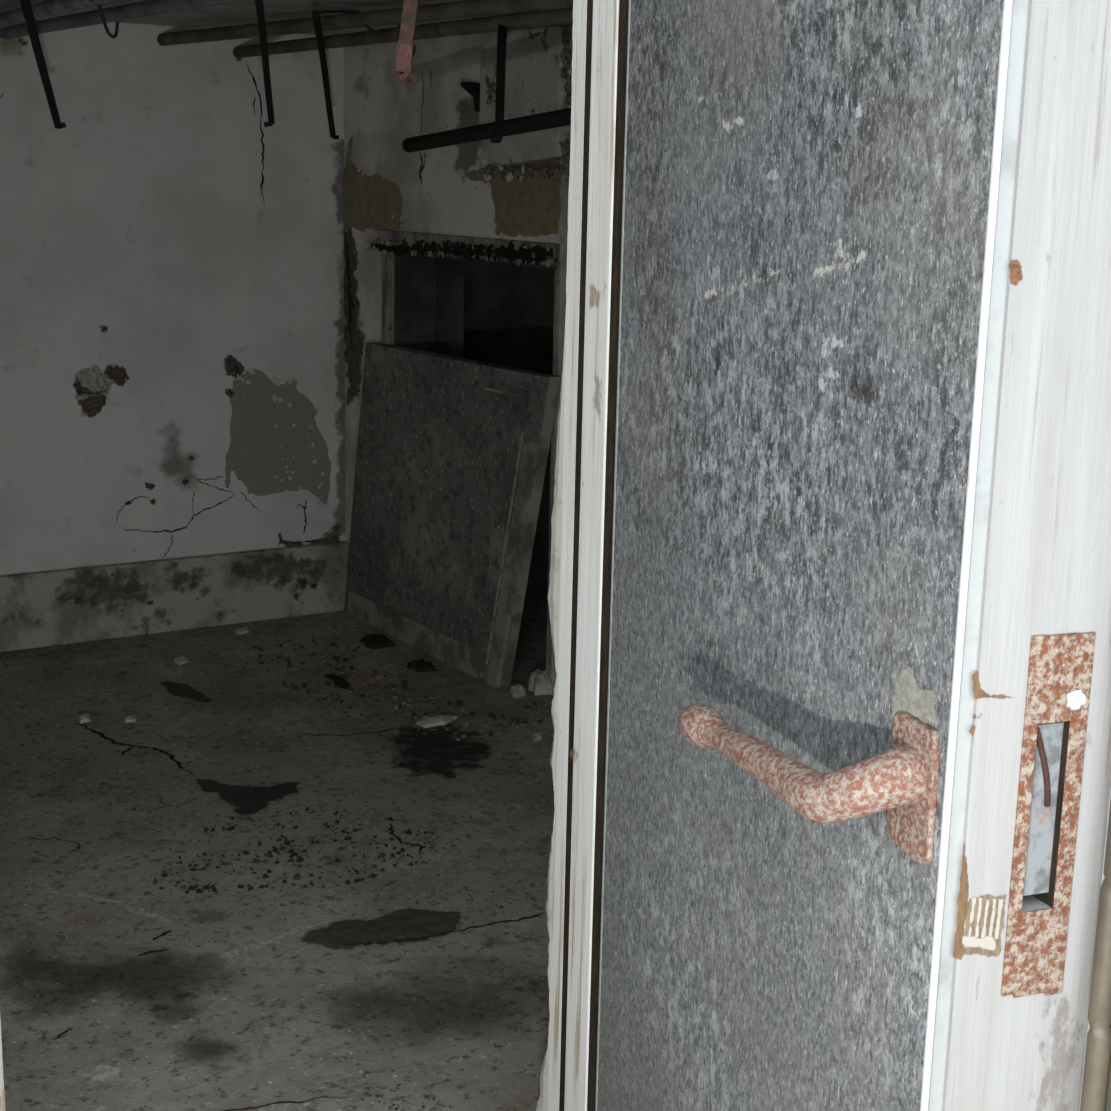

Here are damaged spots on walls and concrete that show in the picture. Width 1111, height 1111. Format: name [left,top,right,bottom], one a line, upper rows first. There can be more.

peeling [528,0,574,109]
crack [246,62,265,204]
corrosion [1009,260,1022,285]
spalling [73,364,129,418]
flaking render [224,355,331,505]
crack [116,476,260,559]
flaking render [343,136,571,1111]
crack [77,723,194,776]
damp [390,725,491,778]
damp [196,779,299,815]
peeling [953,844,1003,960]
crack [223,1096,351,1111]